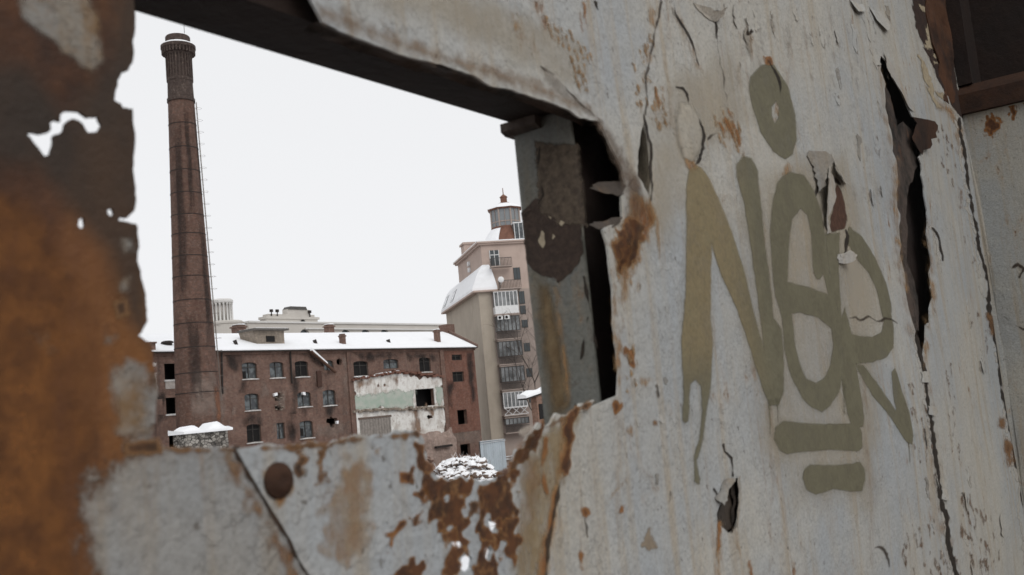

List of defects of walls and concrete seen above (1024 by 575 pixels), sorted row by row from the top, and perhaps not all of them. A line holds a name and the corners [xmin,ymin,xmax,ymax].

crack [645,0,699,115]
corrosion [714,109,741,152]
corrosion [984,103,1024,136]
peeling [521,198,583,282]
corrosion [611,194,660,306]
peeling [807,151,857,264]
corrosion [379,288,592,575]
crack [853,316,969,575]